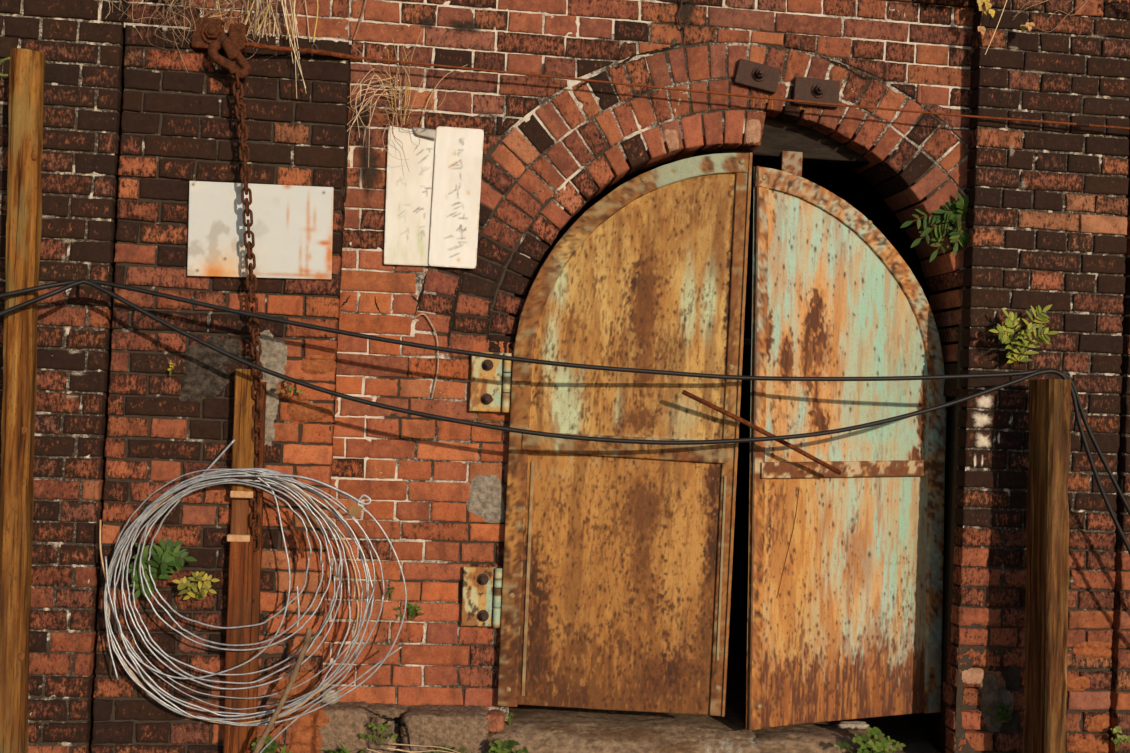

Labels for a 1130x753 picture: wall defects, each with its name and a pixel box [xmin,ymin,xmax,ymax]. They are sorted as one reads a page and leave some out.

spalling [179,335,241,402]
peeling [256,330,287,446]
peeling [466,474,506,523]